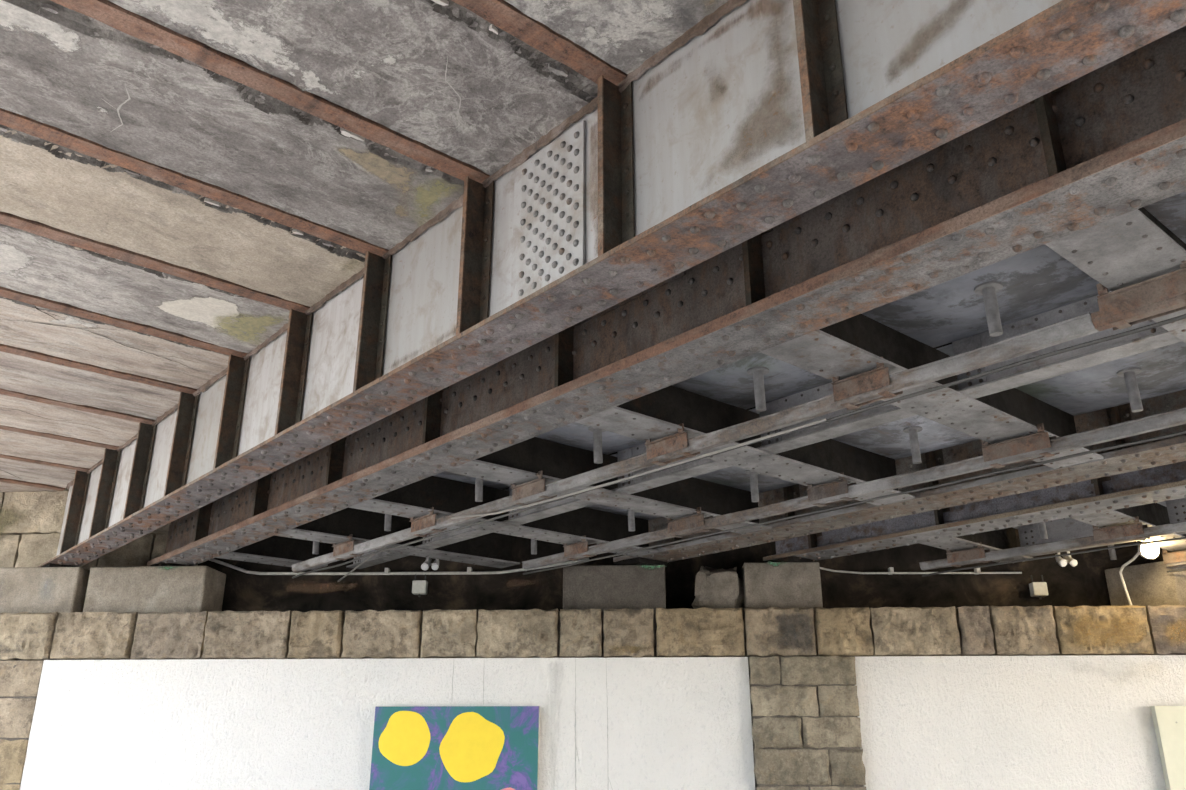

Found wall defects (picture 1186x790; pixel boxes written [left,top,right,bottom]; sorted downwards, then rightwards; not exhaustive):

spalling [0,296,229,356]
peeling [0,224,246,329]